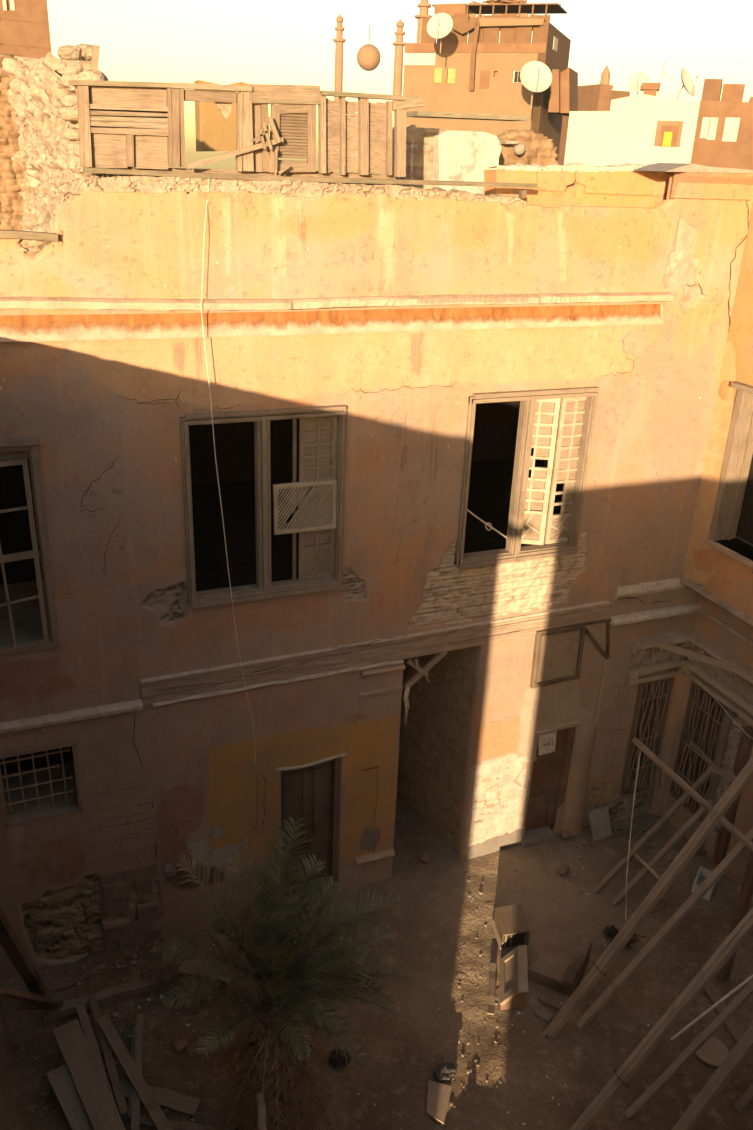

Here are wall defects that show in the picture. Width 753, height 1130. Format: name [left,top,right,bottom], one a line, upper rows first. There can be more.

flaking render [664,214,705,315]
crack [684,200,749,332]
flaking render [408,532,587,629]